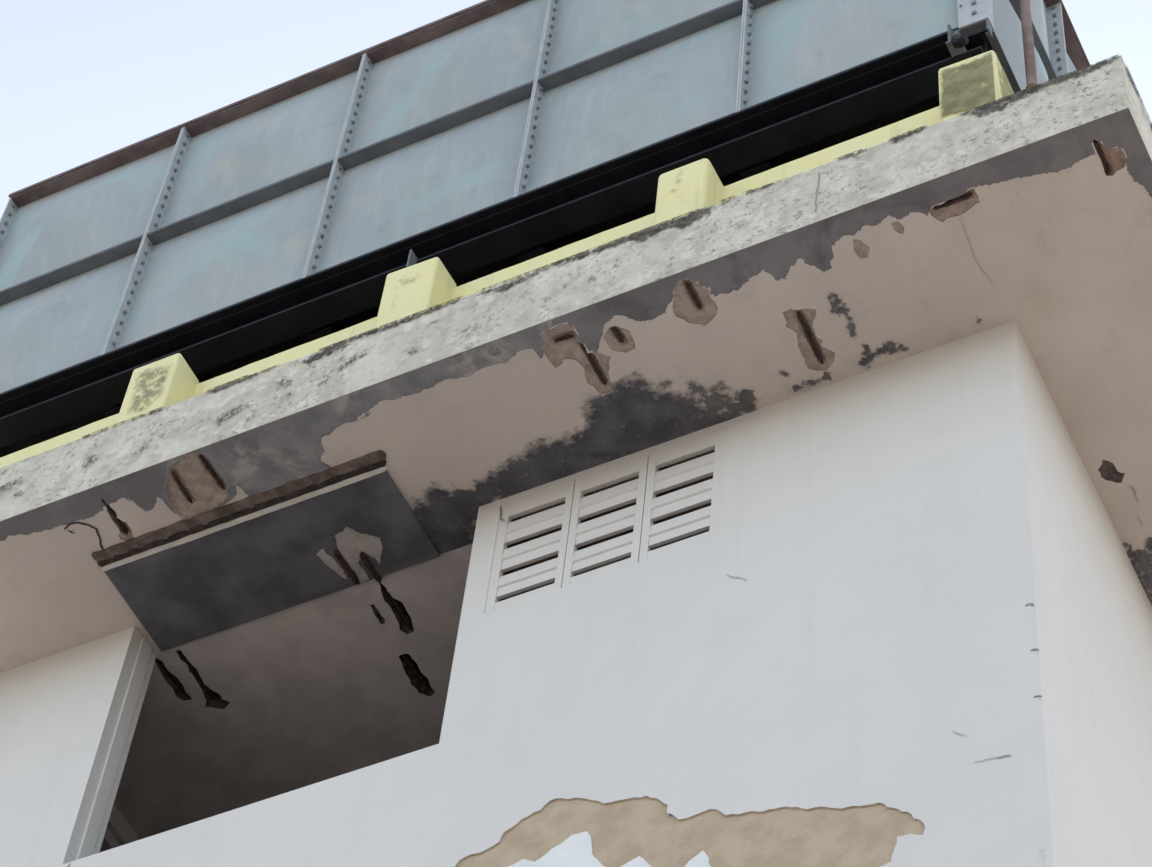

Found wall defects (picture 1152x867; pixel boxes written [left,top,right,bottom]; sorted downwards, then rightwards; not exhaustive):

peeling [0,108,1152,542]
corrosion [91,450,386,562]
water stain [413,374,756,554]
peeling [316,527,414,634]
water stain [1123,537,1152,604]
spalling [155,650,230,709]
spalling [399,654,435,696]
peeling [455,796,925,867]